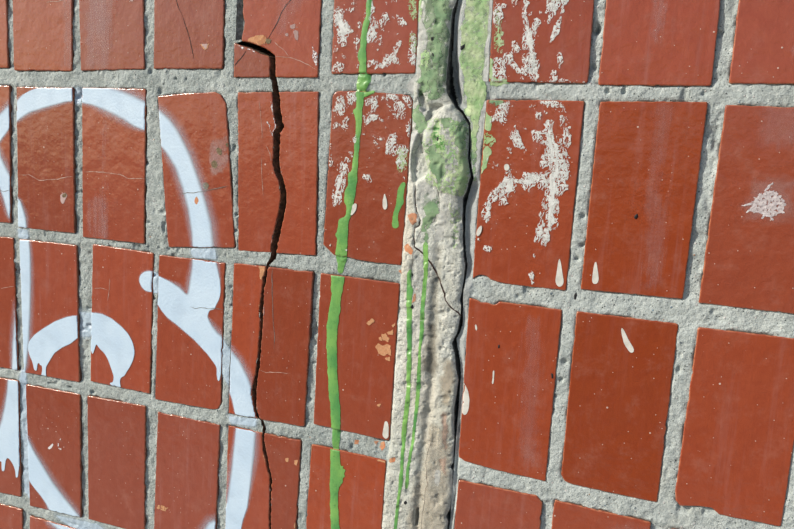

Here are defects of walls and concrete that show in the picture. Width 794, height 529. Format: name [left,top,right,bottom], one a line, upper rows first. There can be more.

crack [235,0,313,529]
crack [411,0,474,529]